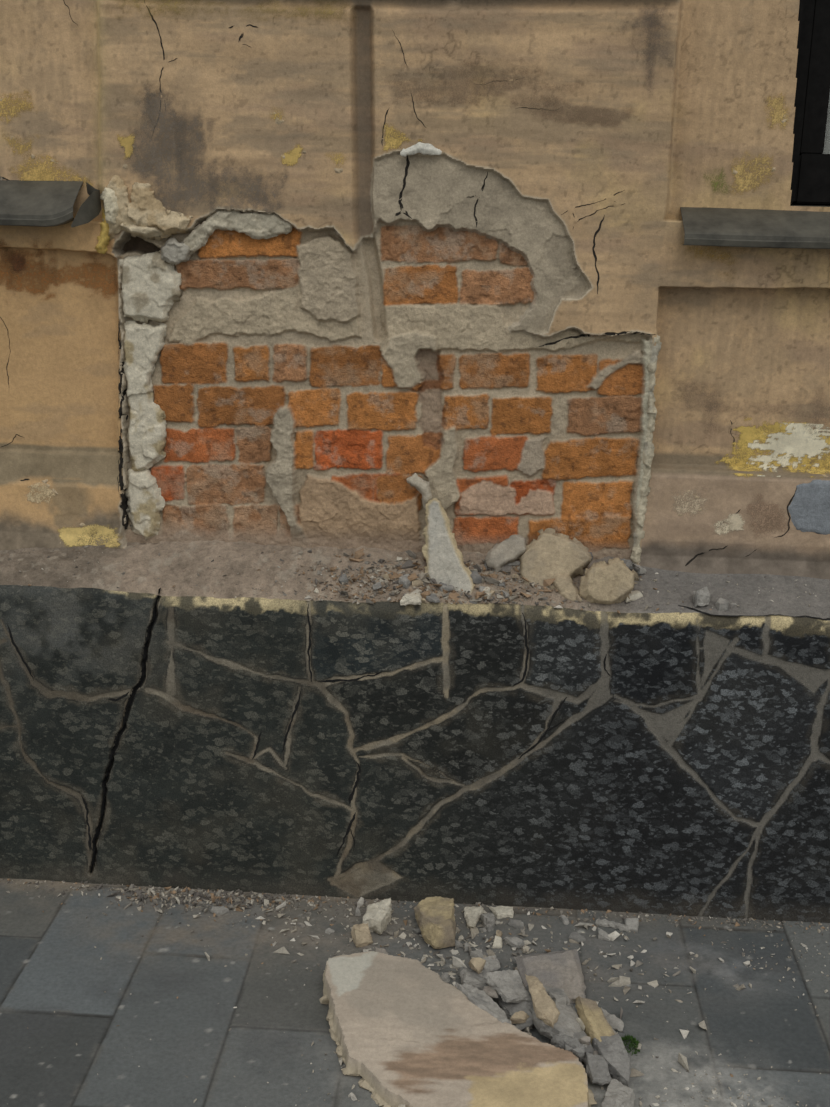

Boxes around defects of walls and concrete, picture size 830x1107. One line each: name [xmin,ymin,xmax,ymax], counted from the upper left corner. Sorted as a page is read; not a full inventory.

flaking render [58,123,662,565]
crack [561,190,624,294]
peeling [716,418,830,477]
crack [81,588,161,873]